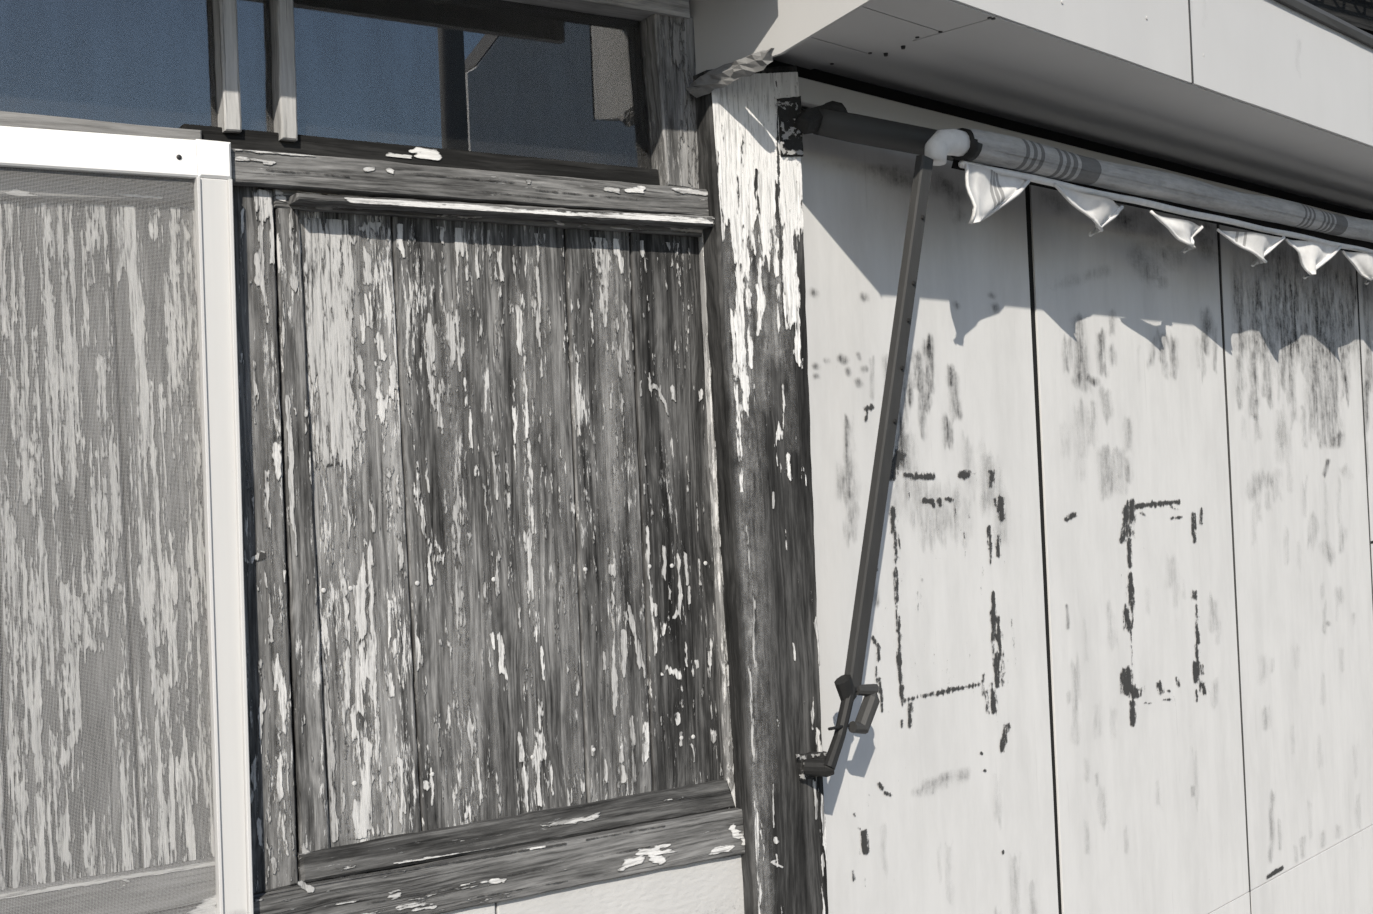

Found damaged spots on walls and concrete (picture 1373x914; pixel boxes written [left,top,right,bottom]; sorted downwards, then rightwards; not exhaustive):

water stain [1239,256,1367,413]
peeling [235,16,810,914]
peeling [0,179,215,899]
peeling [811,599,820,666]
peeling [811,699,823,752]
peeling [187,895,217,914]
peeling [813,777,827,914]